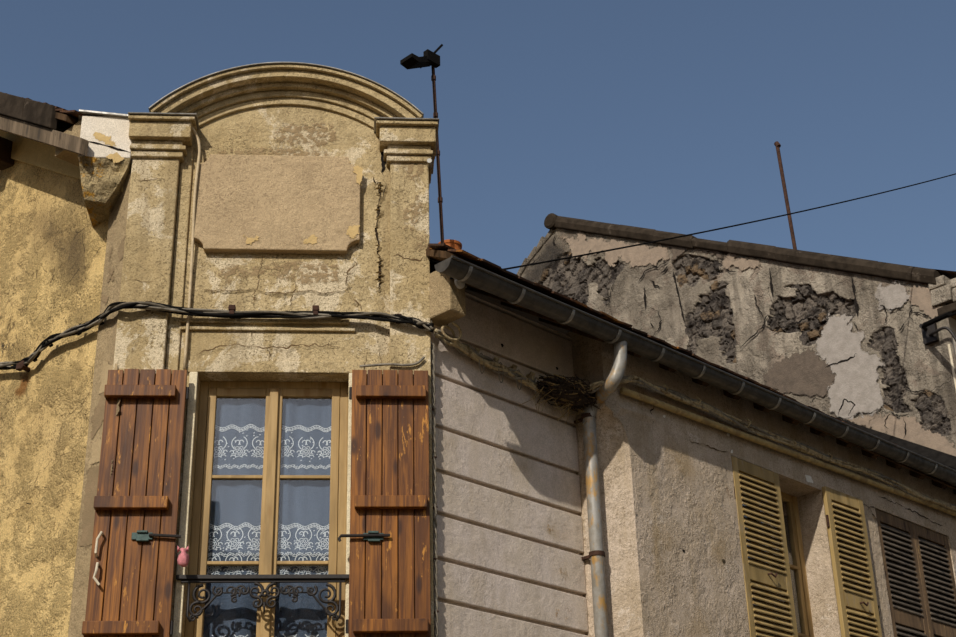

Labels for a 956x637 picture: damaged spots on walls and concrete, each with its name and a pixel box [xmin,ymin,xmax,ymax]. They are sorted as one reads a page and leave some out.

crack [196,152,426,371]
peeling [346,225,360,239]
spalling [538,251,624,306]
crack [639,261,684,332]
spalling [669,246,737,363]
spalling [762,284,859,397]
spalling [867,327,952,436]